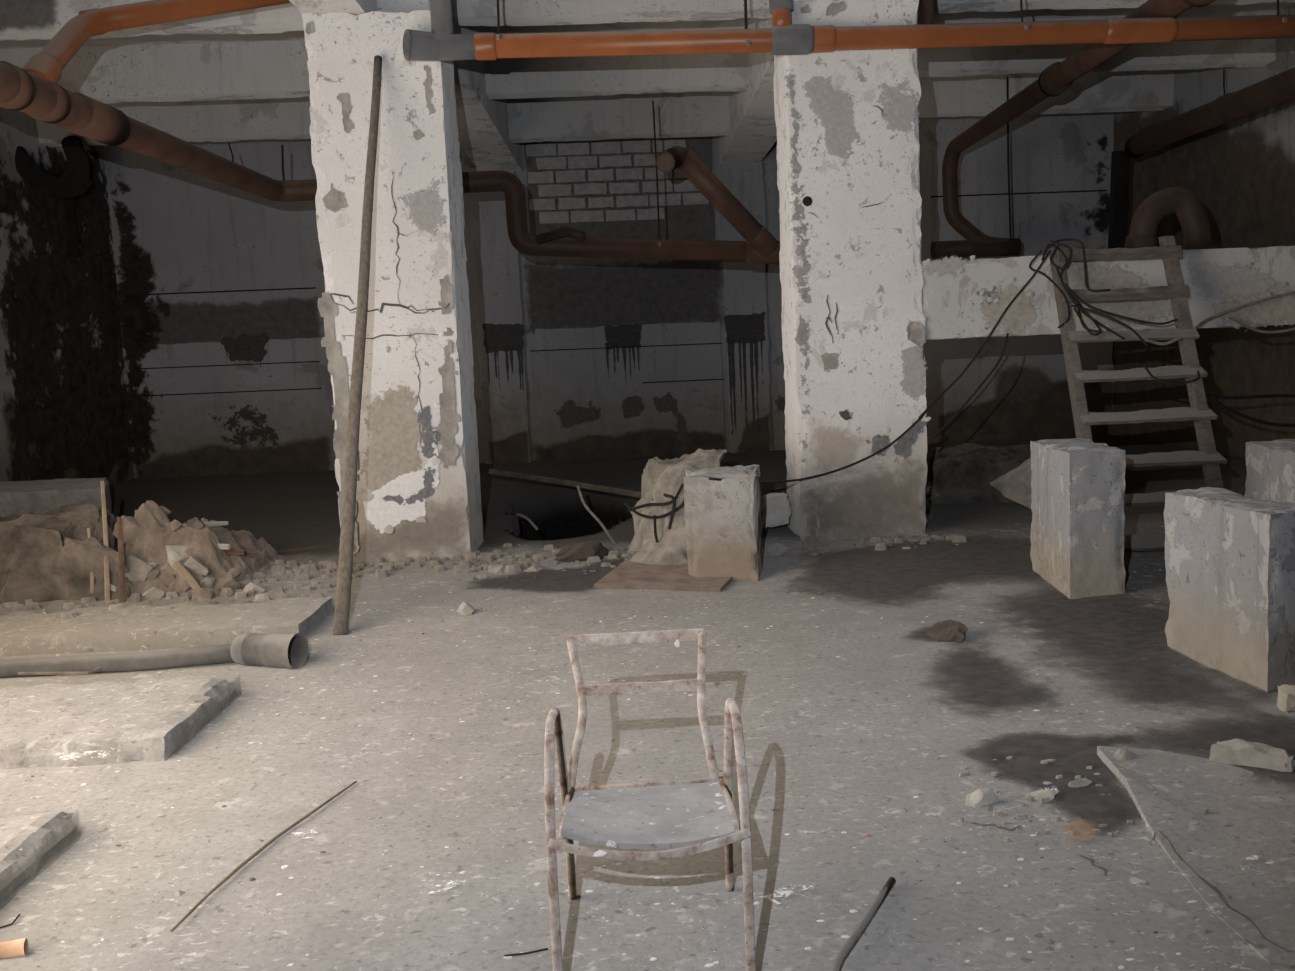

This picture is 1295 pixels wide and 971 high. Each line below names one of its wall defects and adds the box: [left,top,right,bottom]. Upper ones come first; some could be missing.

peeling [877,78,919,141]
water stain [0,145,329,484]
crack [330,172,450,449]
water stain [525,260,722,332]
peeling [318,275,460,556]
water stain [487,338,770,464]
crack [1149,831,1284,949]